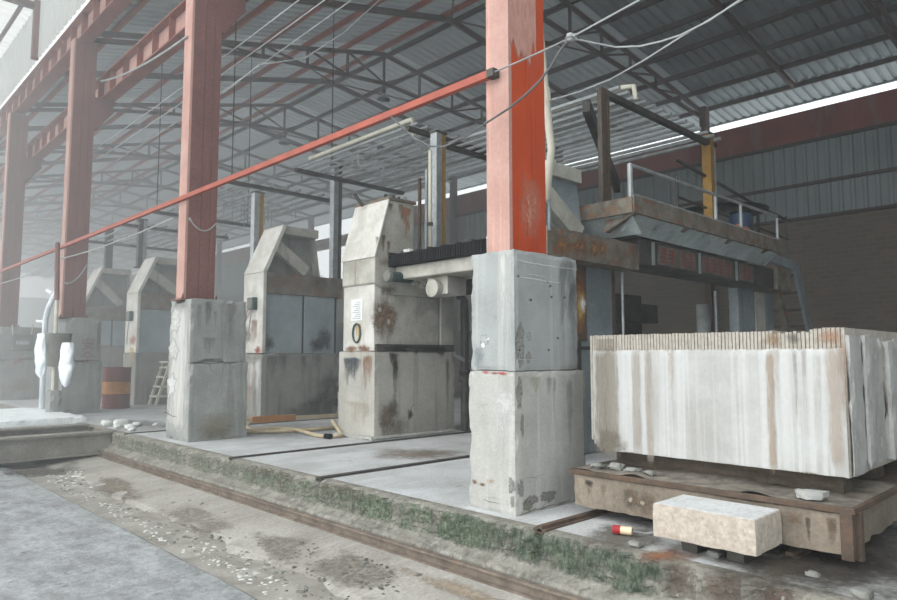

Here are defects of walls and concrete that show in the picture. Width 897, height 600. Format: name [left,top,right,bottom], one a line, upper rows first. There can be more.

corrosion [372,287,396,337]
damp [310,331,331,350]
damp [344,357,359,377]
corrosion [347,346,372,379]
spalling [509,478,556,511]